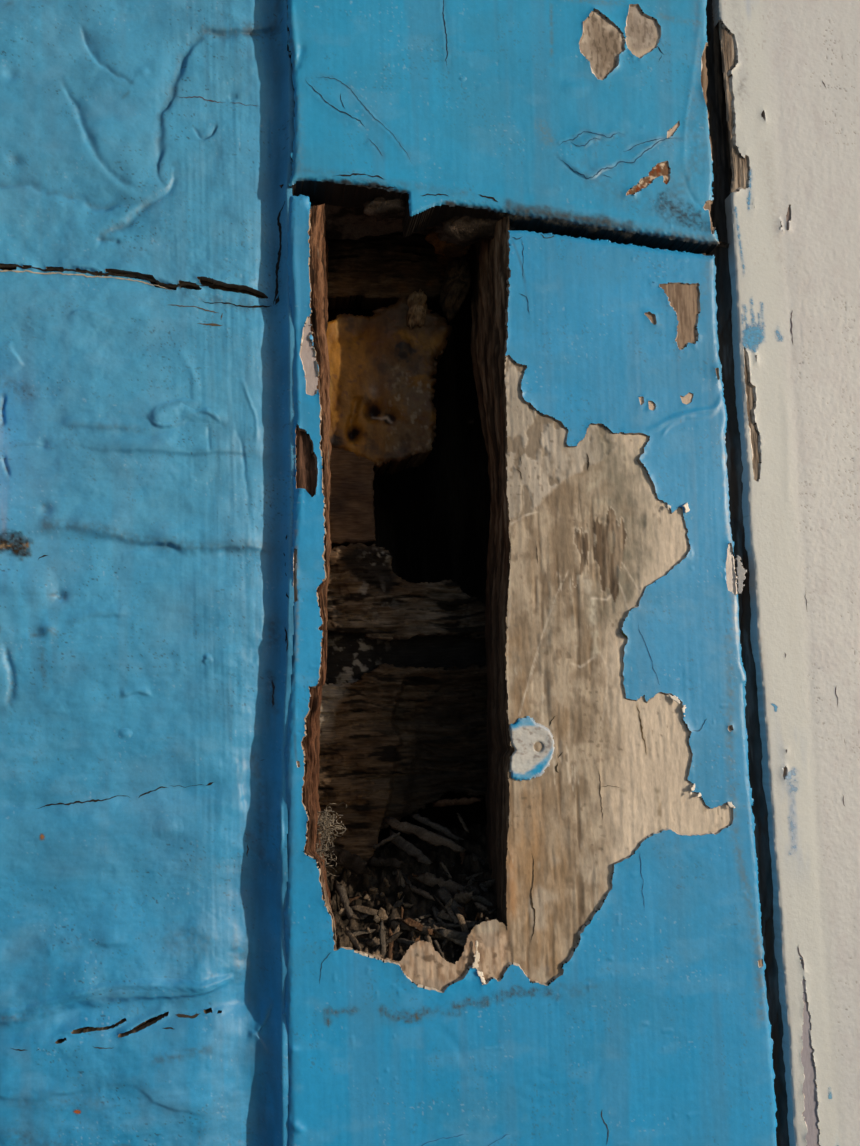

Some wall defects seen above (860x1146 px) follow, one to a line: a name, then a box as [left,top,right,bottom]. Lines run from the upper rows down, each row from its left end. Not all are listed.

peeling [579,4,661,80]
peeling [701,19,750,194]
crack [0,202,285,326]
peeling [703,200,716,234]
peeling [743,347,762,482]
spalling [295,204,338,950]
peeling [354,216,735,993]
crack [10,1008,222,1051]